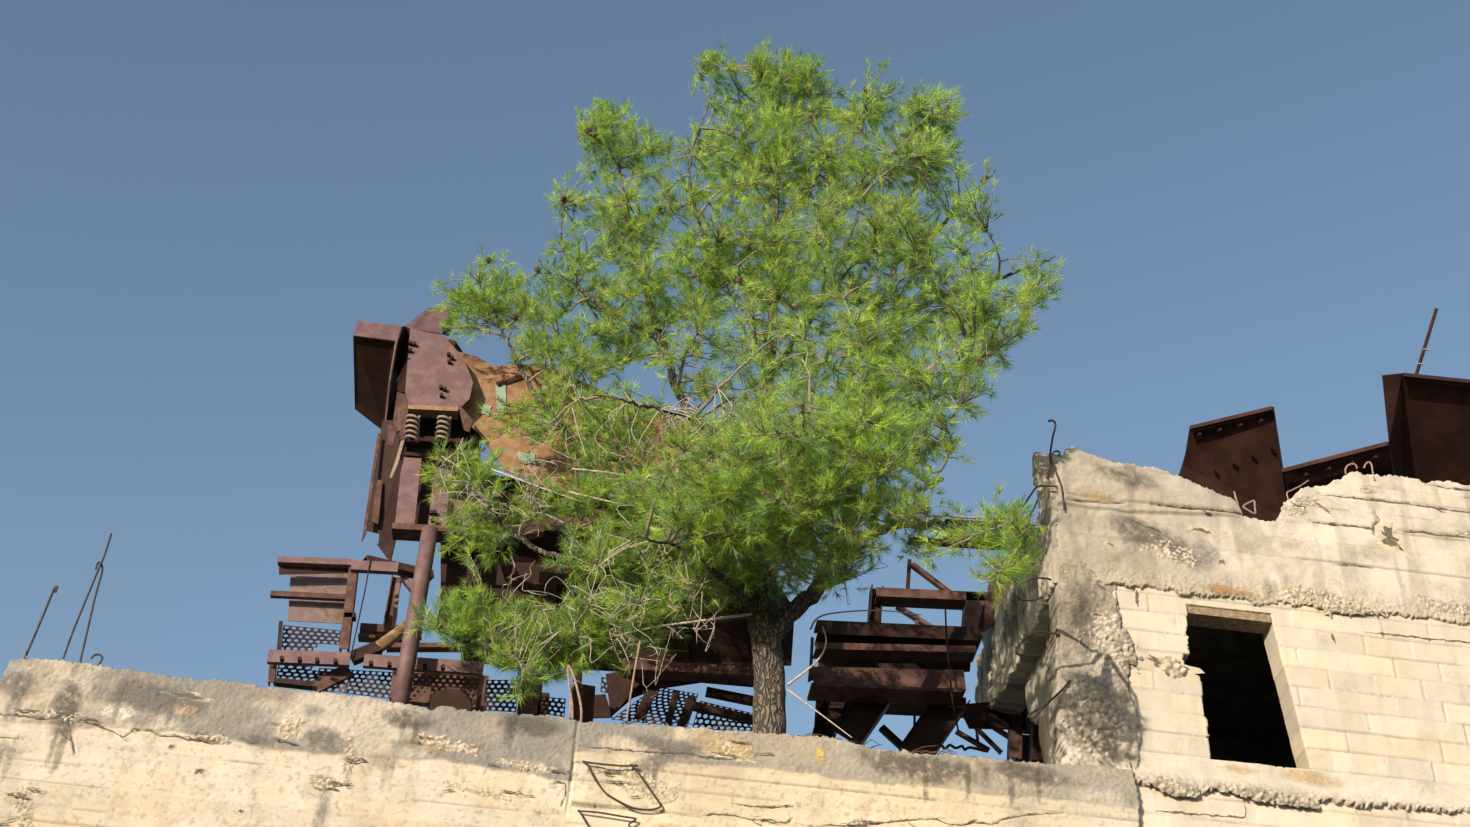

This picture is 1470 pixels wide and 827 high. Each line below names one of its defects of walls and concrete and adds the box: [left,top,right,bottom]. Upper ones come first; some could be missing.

spalling [1019,420,1065,520]
spalling [1233,491,1256,515]
spalling [1281,480,1330,517]
spalling [1344,461,1378,494]
spalling [1137,526,1219,571]
spalling [61,533,112,666]
spalling [1016,577,1052,601]
spalling [20,585,58,660]